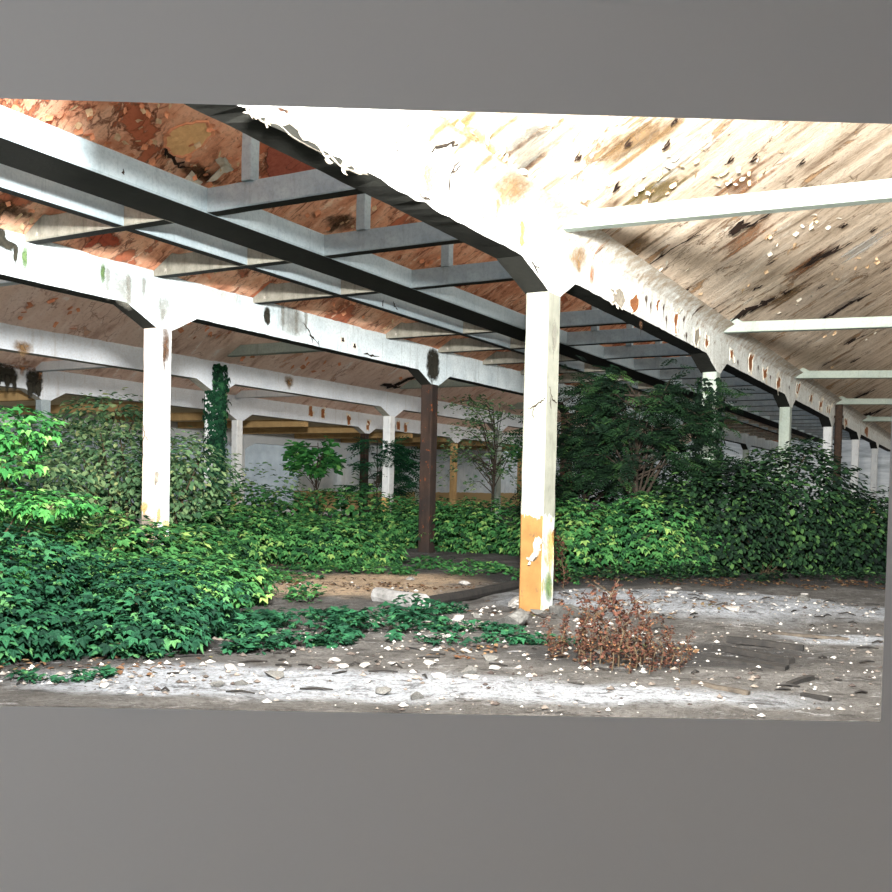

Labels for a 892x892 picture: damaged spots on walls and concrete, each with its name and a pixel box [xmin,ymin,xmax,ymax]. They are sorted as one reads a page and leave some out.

spalling [243,106,368,177]
water stain [599,117,680,171]
crack [418,141,462,203]
water stain [624,134,712,206]
water stain [714,161,775,197]
water stain [0,199,33,218]
water stain [0,228,28,267]
water stain [625,227,665,255]
water stain [766,247,829,310]
water stain [0,364,43,399]
water stain [427,349,440,382]
spalling [526,533,553,570]